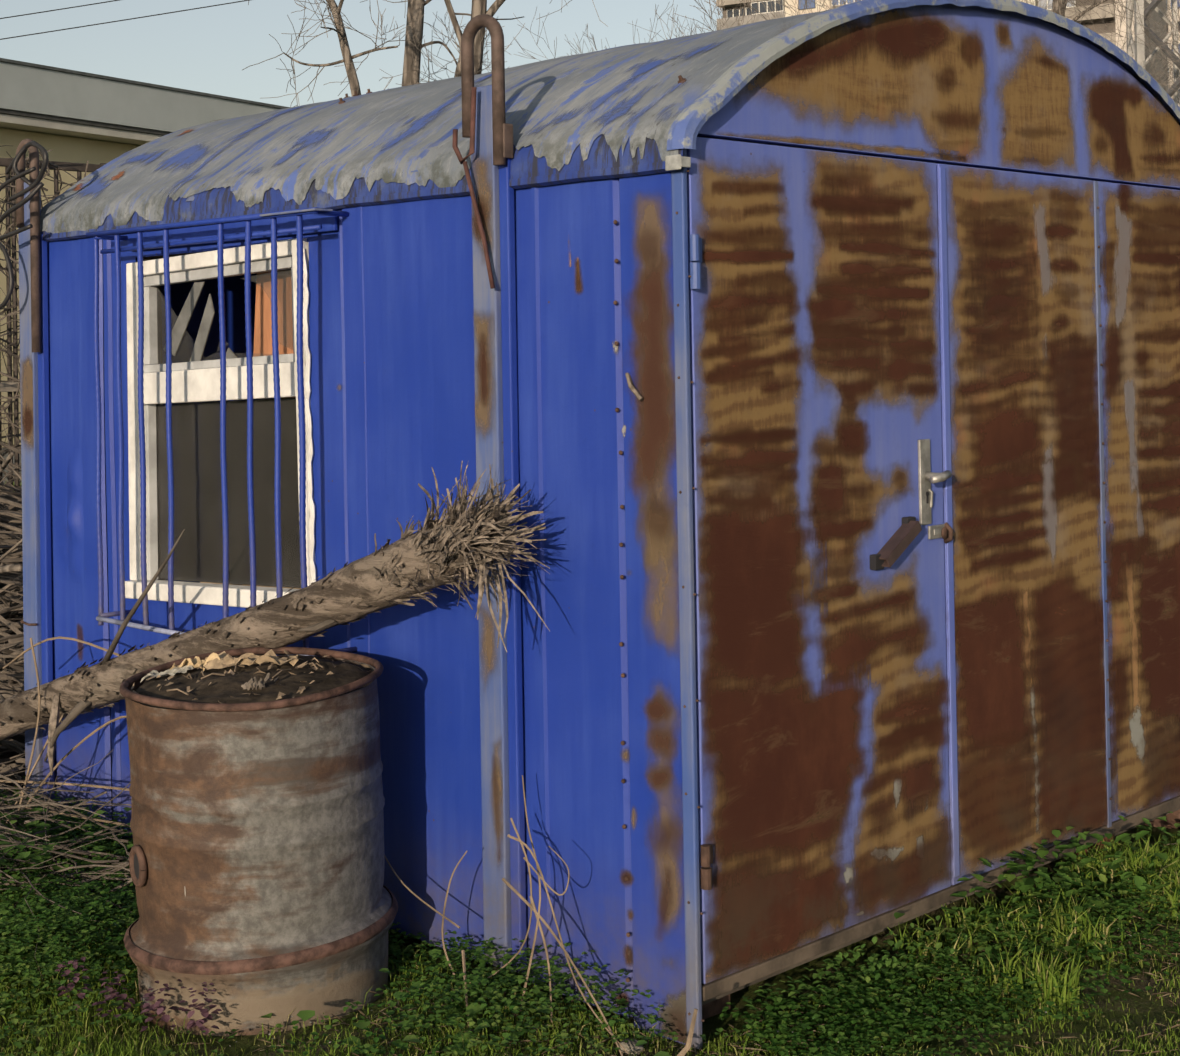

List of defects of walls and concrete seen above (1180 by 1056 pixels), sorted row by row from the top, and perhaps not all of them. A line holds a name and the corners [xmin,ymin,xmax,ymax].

peeling [40,9,831,234]
corrosion [473,159,491,251]
corrosion [474,315,493,434]
corrosion [633,199,678,647]
corrosion [698,8,1180,983]
corrosion [646,691,681,924]